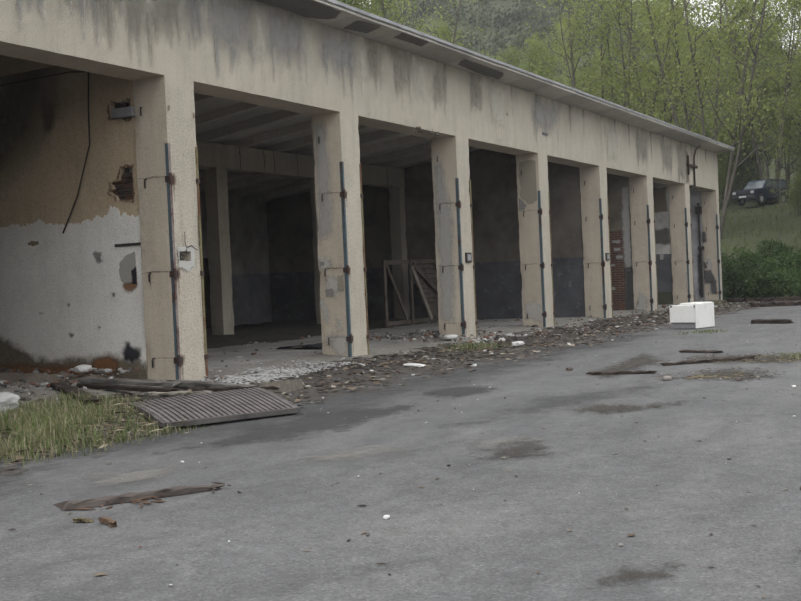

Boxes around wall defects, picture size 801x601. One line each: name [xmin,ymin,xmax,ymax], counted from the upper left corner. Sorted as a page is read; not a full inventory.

damp [190,0,340,64]
damp [323,21,381,71]
damp [394,33,428,47]
damp [459,59,503,101]
spalling [107,98,131,121]
damp [636,133,687,184]
peeling [0,165,147,365]
damp [123,343,140,363]